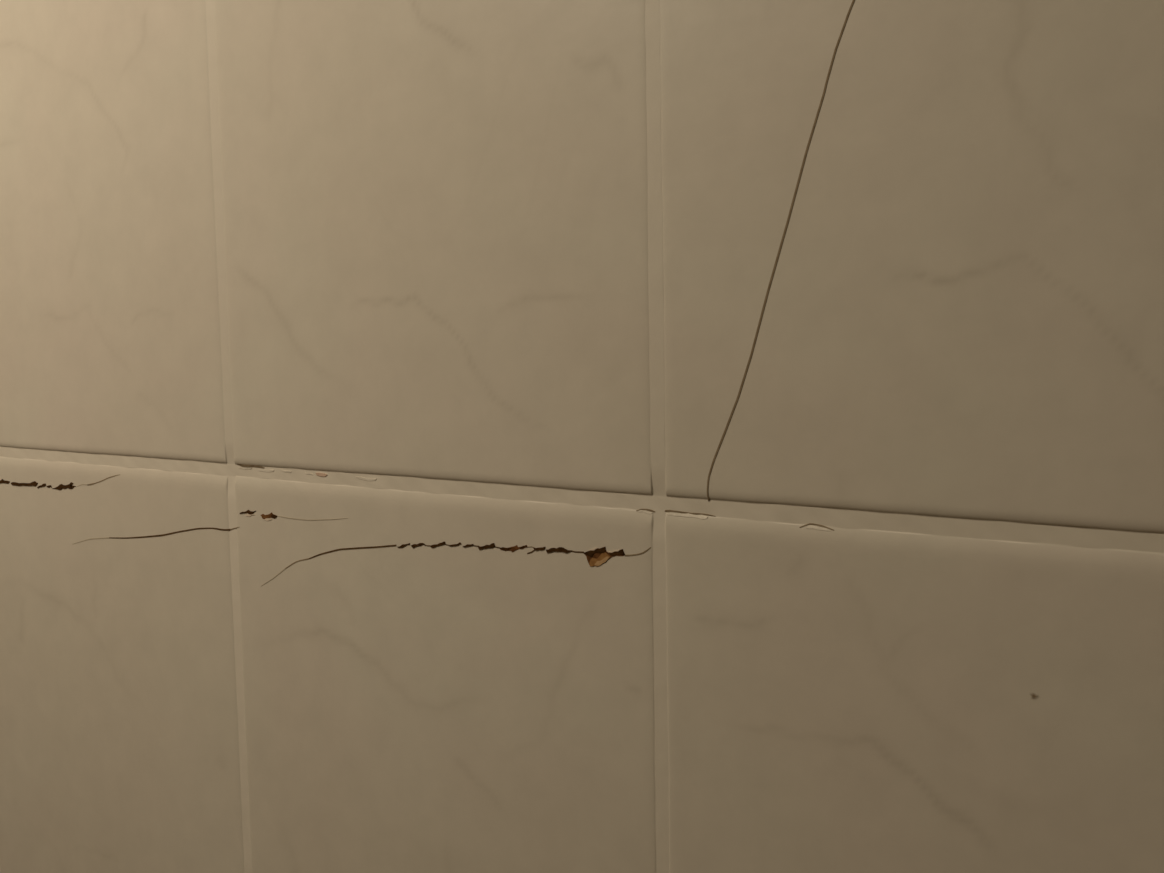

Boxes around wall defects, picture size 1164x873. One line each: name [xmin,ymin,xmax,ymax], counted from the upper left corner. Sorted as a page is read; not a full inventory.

crack [636,0,855,519]
crack [0,475,117,490]
crack [74,527,239,544]
crack [801,523,833,531]
crack [263,542,651,585]